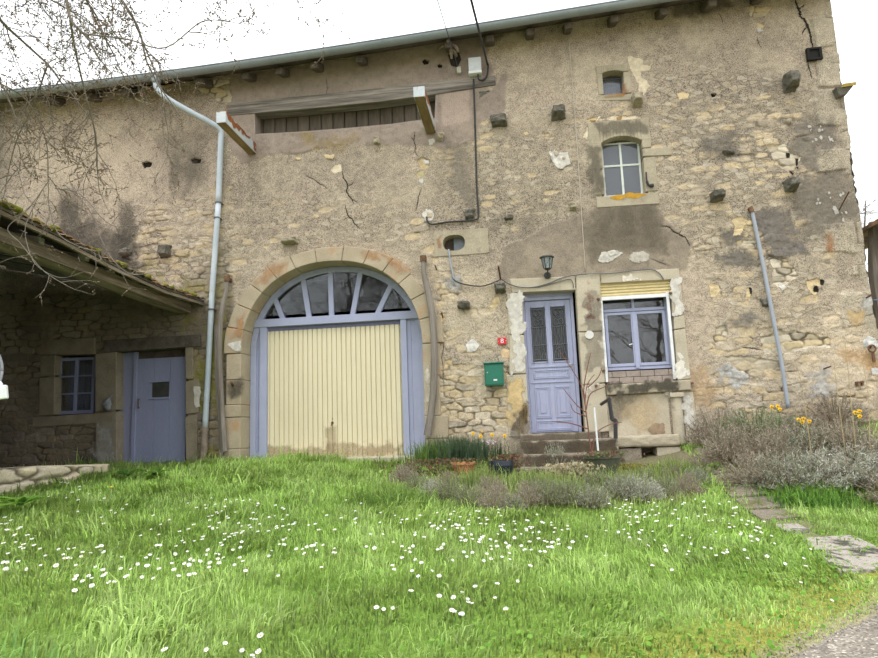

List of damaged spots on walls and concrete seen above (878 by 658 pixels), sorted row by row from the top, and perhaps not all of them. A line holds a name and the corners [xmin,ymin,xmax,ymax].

crack [795,0,813,77]
crack [306,173,360,229]
water stain [591,205,658,260]
water stain [756,119,860,259]